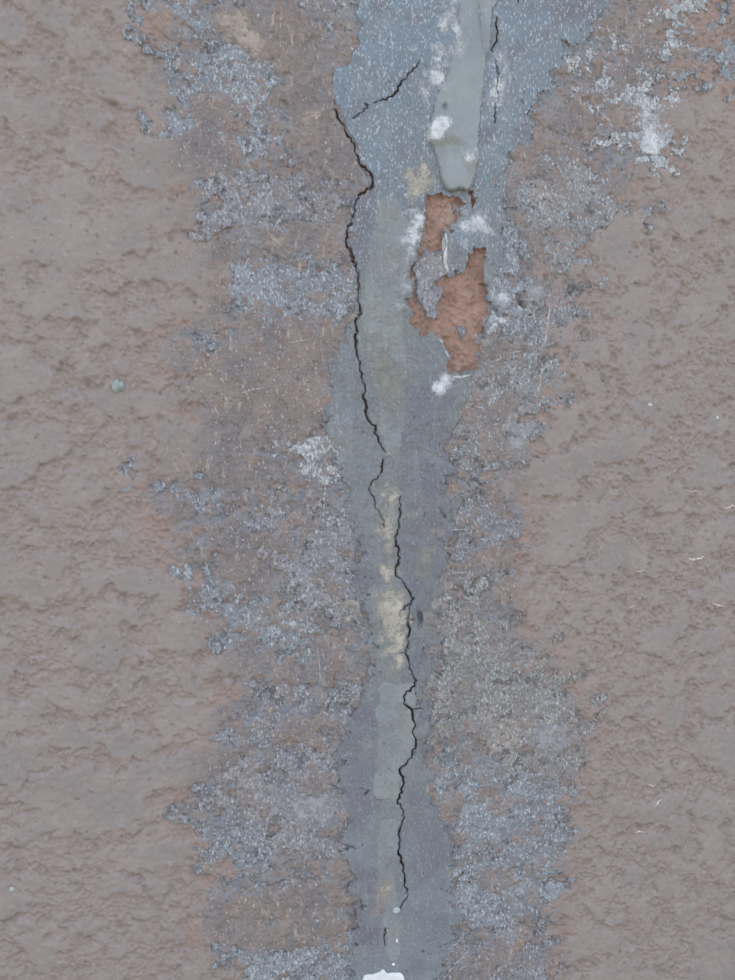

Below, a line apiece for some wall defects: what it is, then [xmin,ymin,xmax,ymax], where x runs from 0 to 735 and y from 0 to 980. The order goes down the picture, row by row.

crack [491,16,499,124]
spalling [405,189,491,378]
crack [334,63,419,908]